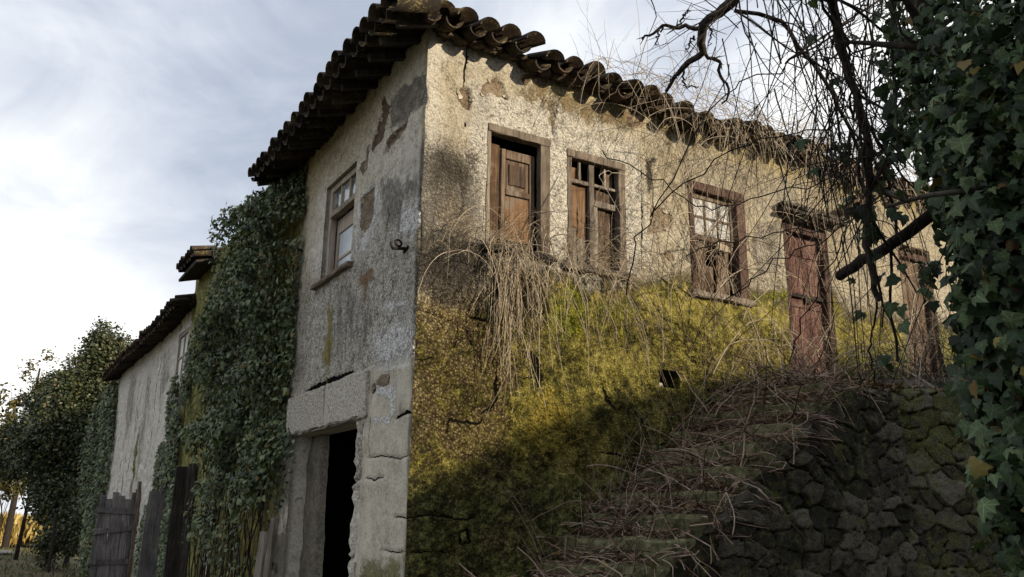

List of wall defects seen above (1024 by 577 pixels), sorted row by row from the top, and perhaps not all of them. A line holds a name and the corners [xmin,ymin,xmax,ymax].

crack [463,48,473,84]
spalling [457,77,509,110]
flaking render [360,73,427,175]
peeling [359,187,375,238]
leakage [325,285,416,382]
crack [306,371,354,391]
crack [367,401,409,481]